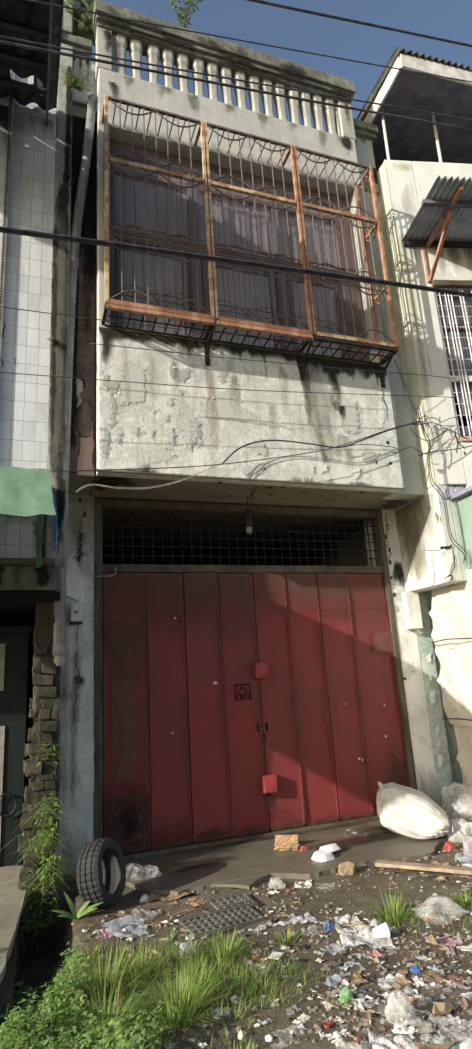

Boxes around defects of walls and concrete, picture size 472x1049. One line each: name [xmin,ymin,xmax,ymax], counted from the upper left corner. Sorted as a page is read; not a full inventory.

peeling [75,379,84,407]
peeling [77,360,147,492]
peeling [169,357,191,397]
leakage [0,58,387,586]
spalling [77,498,86,561]
crack [70,624,80,808]